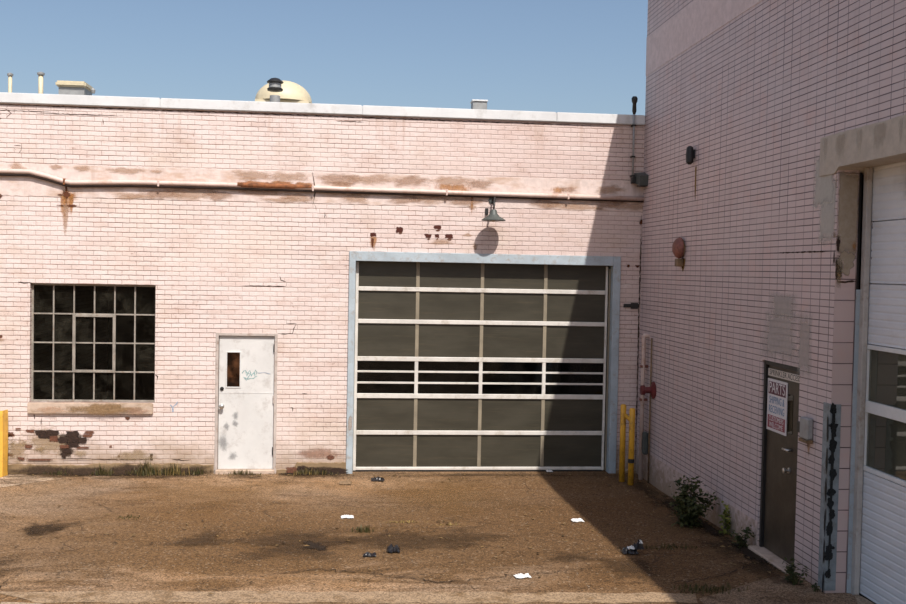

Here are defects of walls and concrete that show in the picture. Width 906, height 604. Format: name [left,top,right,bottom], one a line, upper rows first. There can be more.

rust [237,181,312,189]
rust [58,186,77,228]
spalling [424,225,453,244]
peeling [833,172,859,283]
peeling [8,428,94,461]